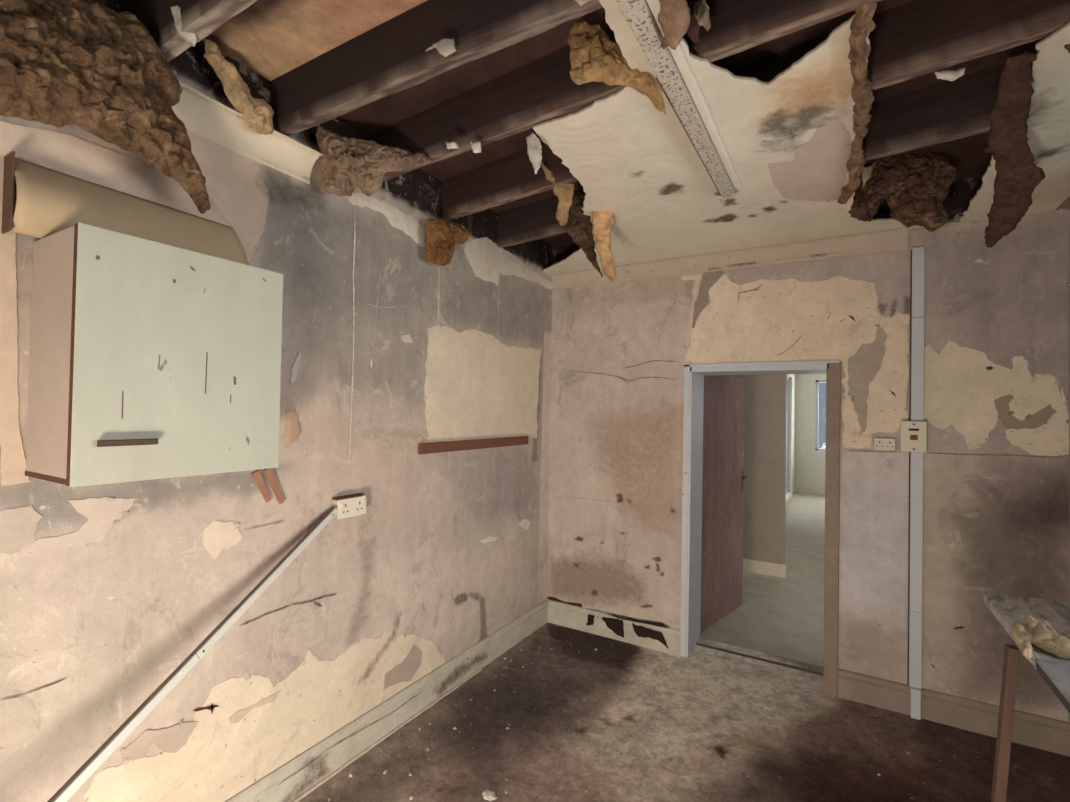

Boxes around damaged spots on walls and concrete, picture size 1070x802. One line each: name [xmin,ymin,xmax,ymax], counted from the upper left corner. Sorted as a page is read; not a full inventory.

damp [762,84,825,139]
flaking render [347,193,426,247]
flaking render [464,237,553,290]
flaking render [423,323,541,443]
peeling [683,274,910,448]
peeling [924,341,1069,456]
peeling [0,497,135,555]
peeling [586,614,669,648]
peeling [84,629,447,802]